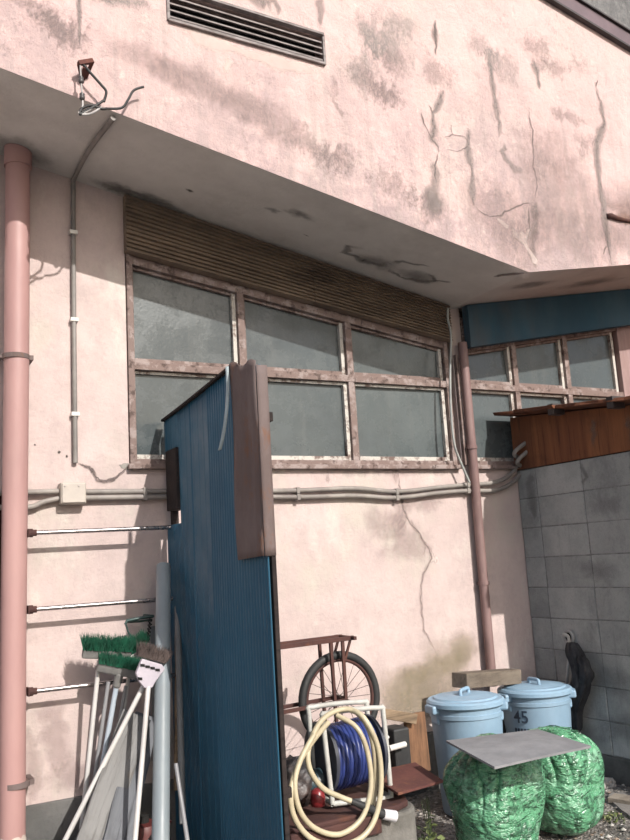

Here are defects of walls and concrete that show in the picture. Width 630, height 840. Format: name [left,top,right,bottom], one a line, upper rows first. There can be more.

crack [532,62,540,86]
crack [421,94,539,254]
crack [594,81,610,255]
crack [399,488,432,637]